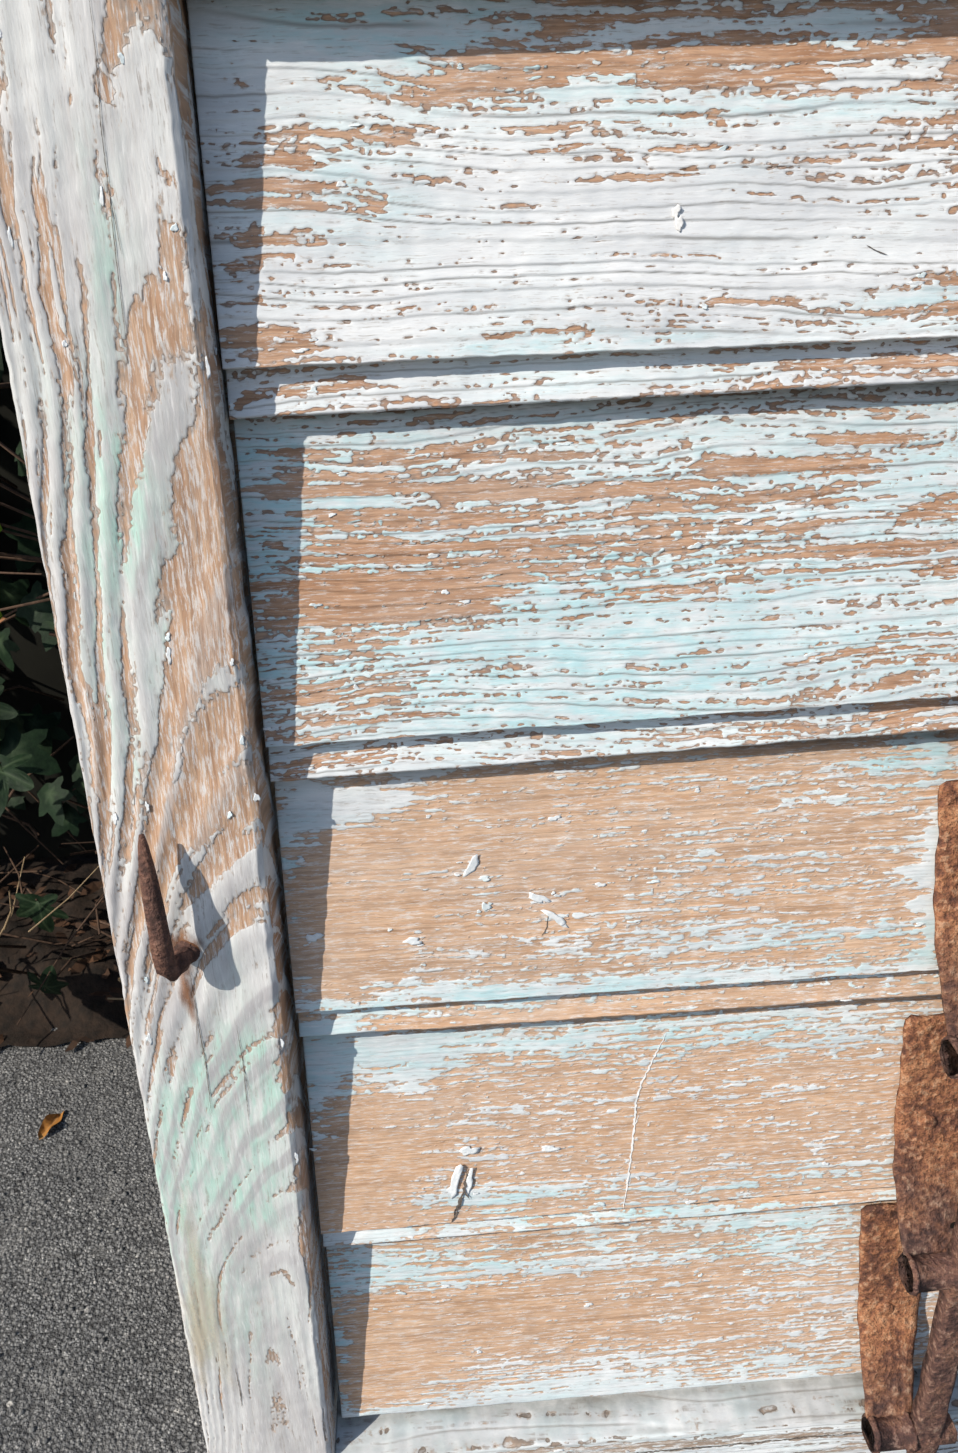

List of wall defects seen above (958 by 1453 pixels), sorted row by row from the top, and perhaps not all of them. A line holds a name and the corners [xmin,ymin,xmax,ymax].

peeling [40,0,66,59]
peeling [317,0,958,198]
peeling [447,185,538,224]
peeling [791,195,927,217]
peeling [556,219,721,267]
peeling [314,302,421,324]
peeling [463,300,652,360]
peeling [625,610,724,674]
peeling [112,871,182,1103]
rust [180,971,194,1016]
peeling [913,1291,939,1374]
peeling [471,1399,869,1453]